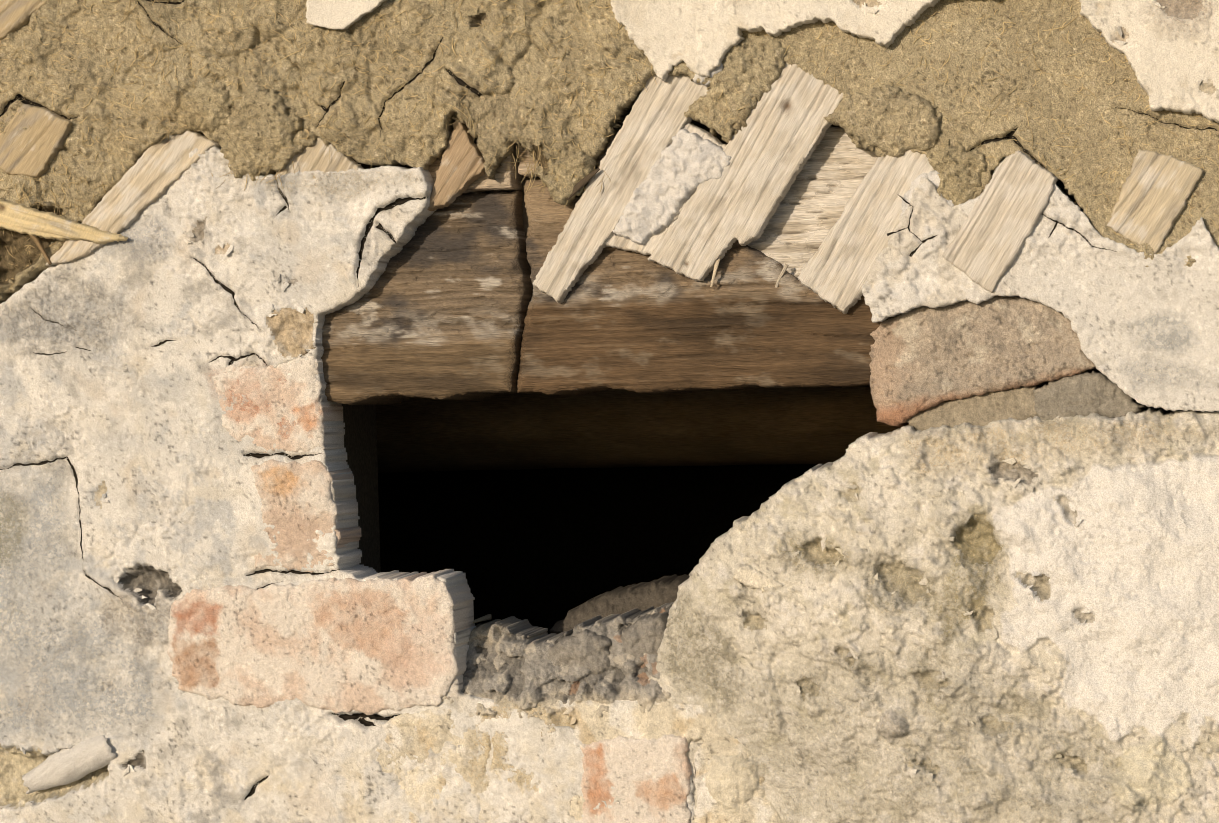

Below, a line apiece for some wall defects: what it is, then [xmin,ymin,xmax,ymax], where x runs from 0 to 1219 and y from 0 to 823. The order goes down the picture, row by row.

crack [0,94,78,120]
peeling [306,0,386,30]
crack [378,36,484,136]
peeling [611,0,940,82]
peeling [1079,0,1219,123]
crack [969,127,1047,170]
spalling [183,216,233,256]
crack [356,197,428,287]
crack [193,258,315,367]
crack [0,457,122,600]
spalling [114,565,182,613]
spalling [793,537,850,567]